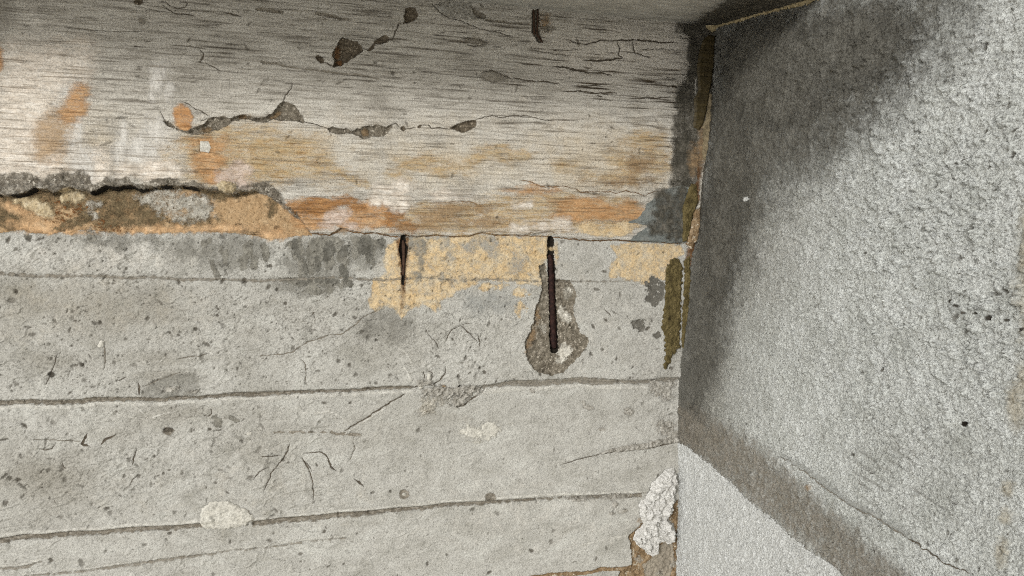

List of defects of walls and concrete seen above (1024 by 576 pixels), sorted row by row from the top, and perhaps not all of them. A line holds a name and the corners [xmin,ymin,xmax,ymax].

water stain [0,38,182,184]
water stain [214,161,252,193]
water stain [369,178,410,213]
crack [161,1,681,153]
water stain [430,190,459,201]
rust [286,132,704,318]
water stain [511,218,572,234]
water stain [670,0,970,436]
spalling [525,236,589,376]
crack [254,323,480,499]
spalling [531,500,678,576]